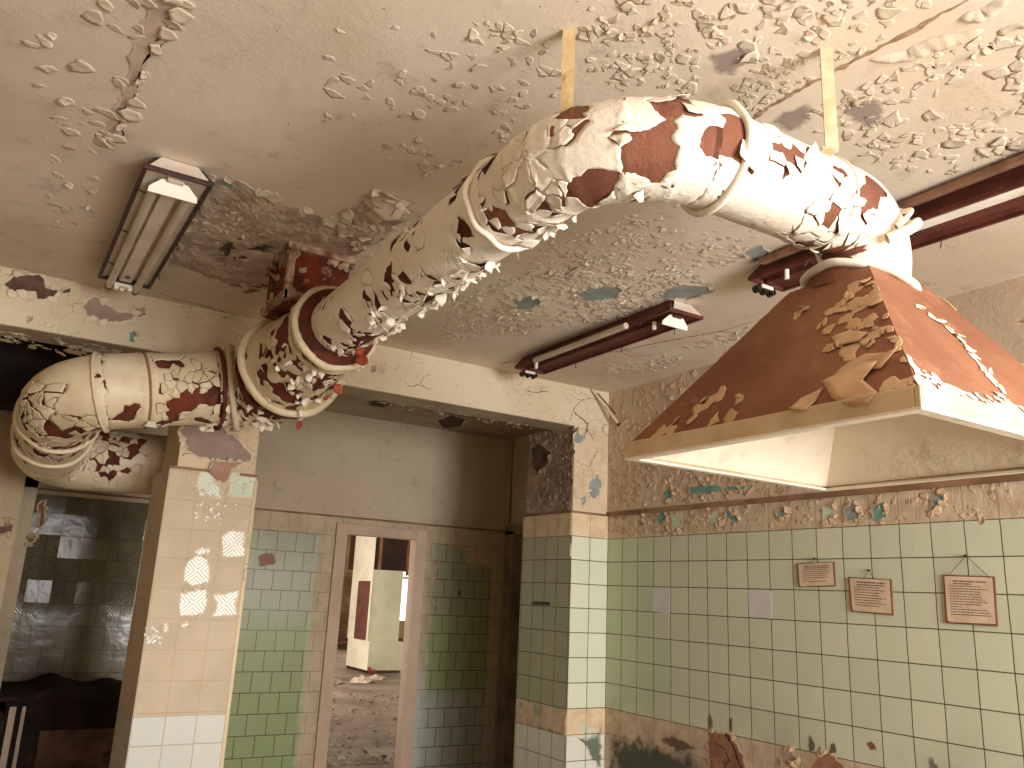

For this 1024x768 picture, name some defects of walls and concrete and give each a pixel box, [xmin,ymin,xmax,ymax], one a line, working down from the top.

peeling [837,24,1024,175]
peeling [0,0,932,629]
crack [570,398,598,469]
peeling [927,488,949,518]
peeling [144,621,169,645]
leakage [580,734,694,768]
peeling [704,728,747,768]
peeling [777,744,845,768]